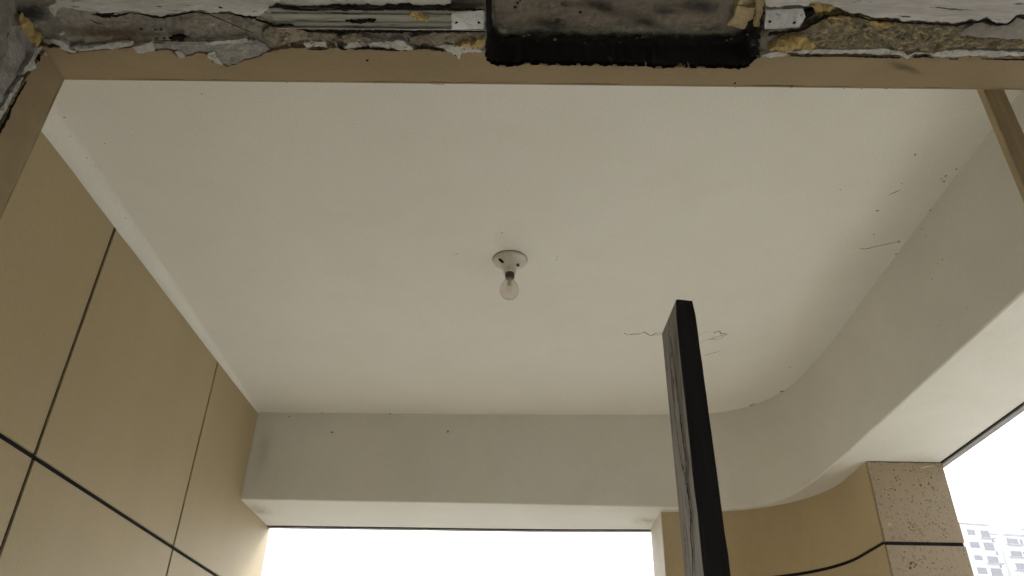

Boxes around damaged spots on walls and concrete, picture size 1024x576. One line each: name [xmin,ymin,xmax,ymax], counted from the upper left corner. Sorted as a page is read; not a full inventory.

spalling [0,0,736,120]
spalling [746,0,1024,59]
crack [624,326,727,576]